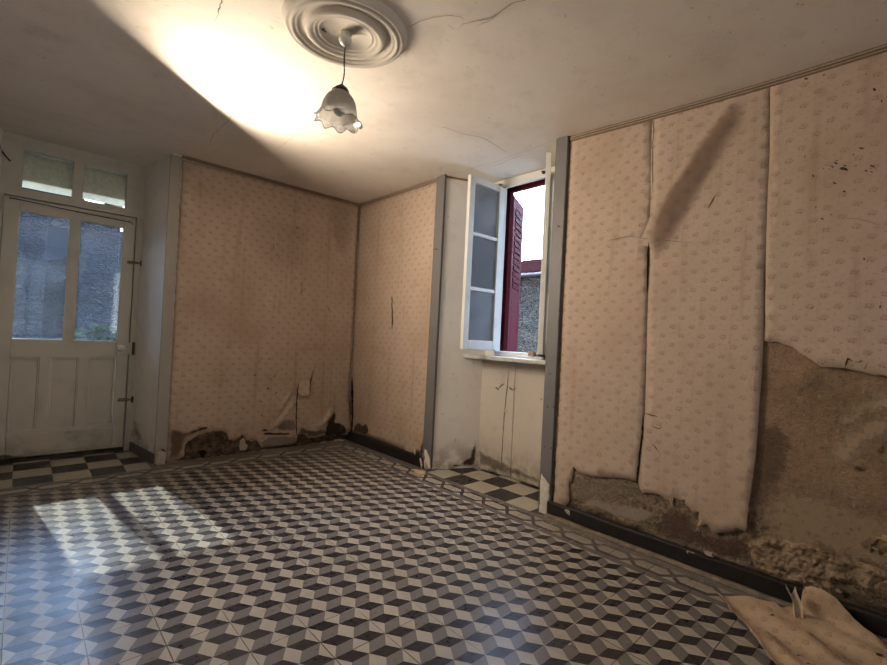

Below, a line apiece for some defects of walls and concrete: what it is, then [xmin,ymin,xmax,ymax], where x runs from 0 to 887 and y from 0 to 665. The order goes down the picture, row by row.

crack [412,0,525,30]
damp [655,118,730,244]
flaking render [156,431,346,465]
flaking render [565,502,887,597]